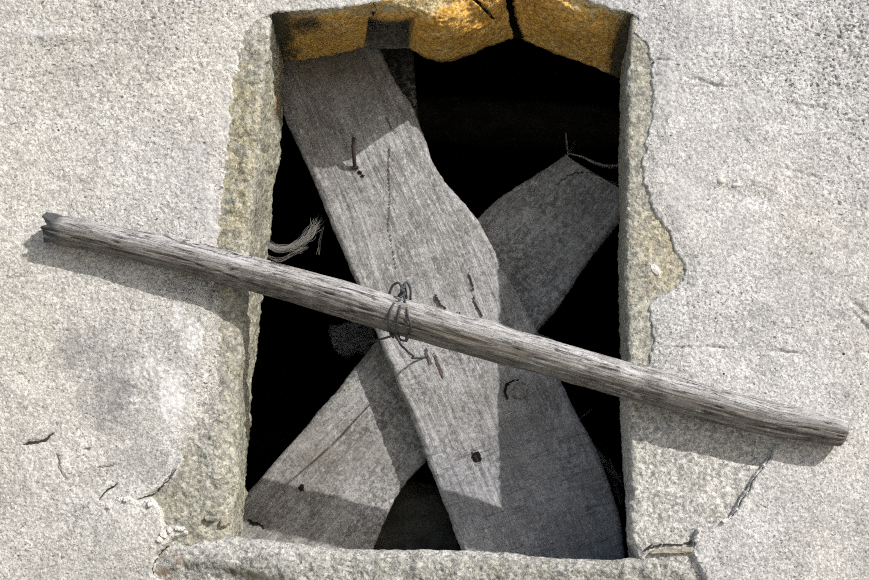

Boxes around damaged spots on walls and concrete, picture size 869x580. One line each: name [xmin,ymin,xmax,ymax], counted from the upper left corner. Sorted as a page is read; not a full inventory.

crack [476,0,524,39]
peeling [217,16,268,254]
peeling [627,15,684,367]
crack [23,434,67,479]
crack [138,470,176,500]
leakage [118,295,205,461]
peeling [101,282,242,548]
crack [730,456,771,519]